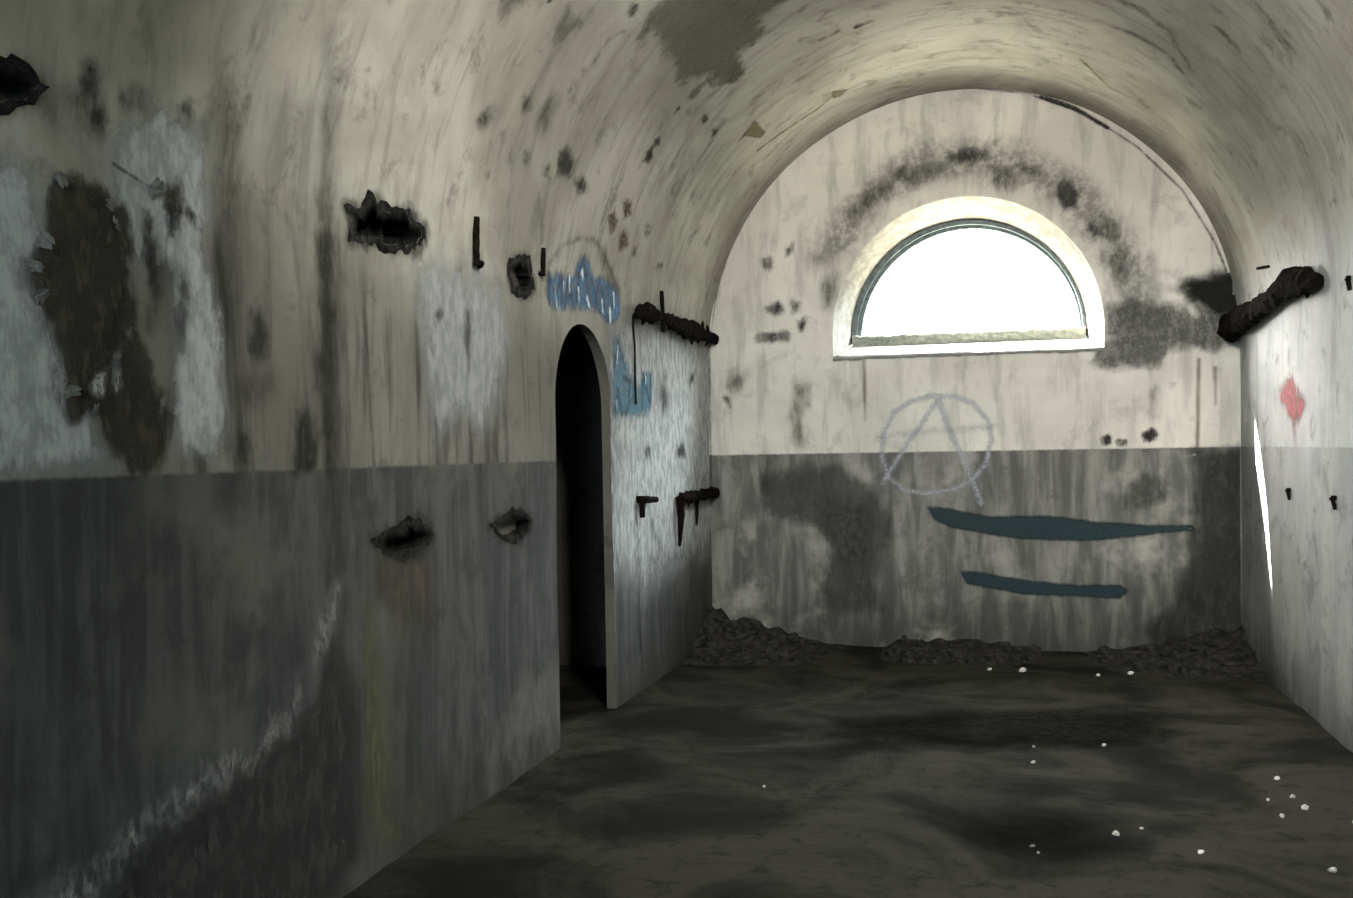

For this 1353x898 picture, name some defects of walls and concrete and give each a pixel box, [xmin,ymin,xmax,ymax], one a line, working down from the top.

peeling [629,0,785,110]
damp [950,149,986,163]
spalling [343,189,428,257]
damp [1057,180,1078,208]
damp [146,241,160,299]
damp [757,302,805,341]